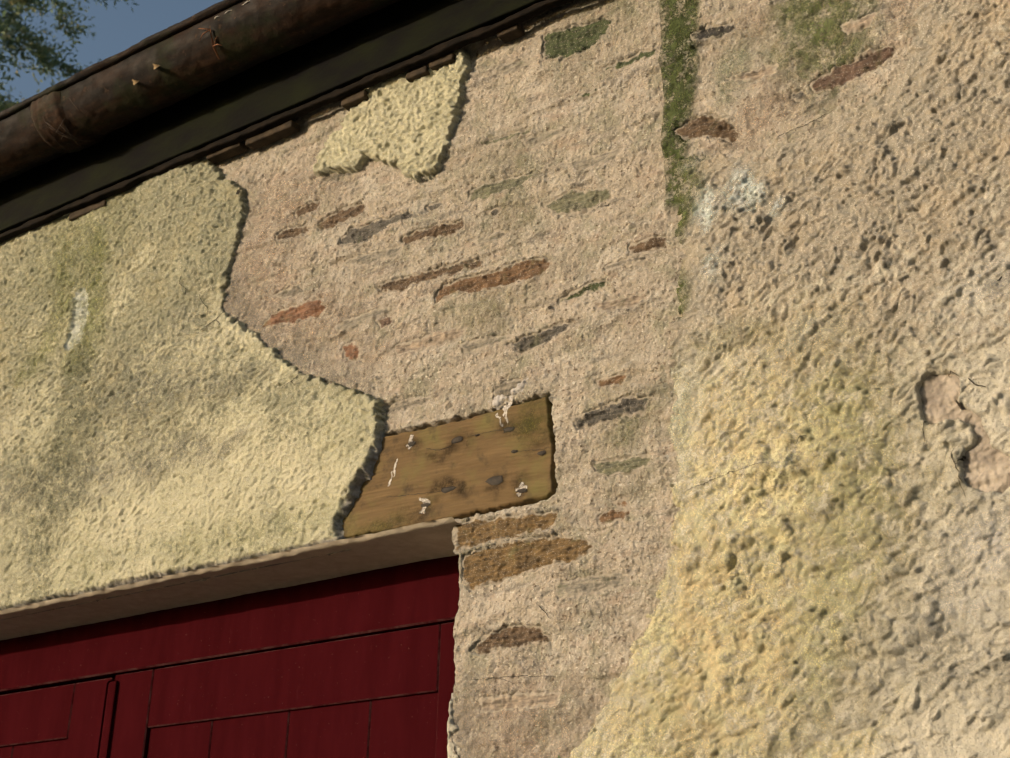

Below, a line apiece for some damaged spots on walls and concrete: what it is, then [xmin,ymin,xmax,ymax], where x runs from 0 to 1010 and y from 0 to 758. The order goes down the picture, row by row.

damp [661,0,699,233]
spalling [217,0,942,758]
spalling [920,374,1010,493]